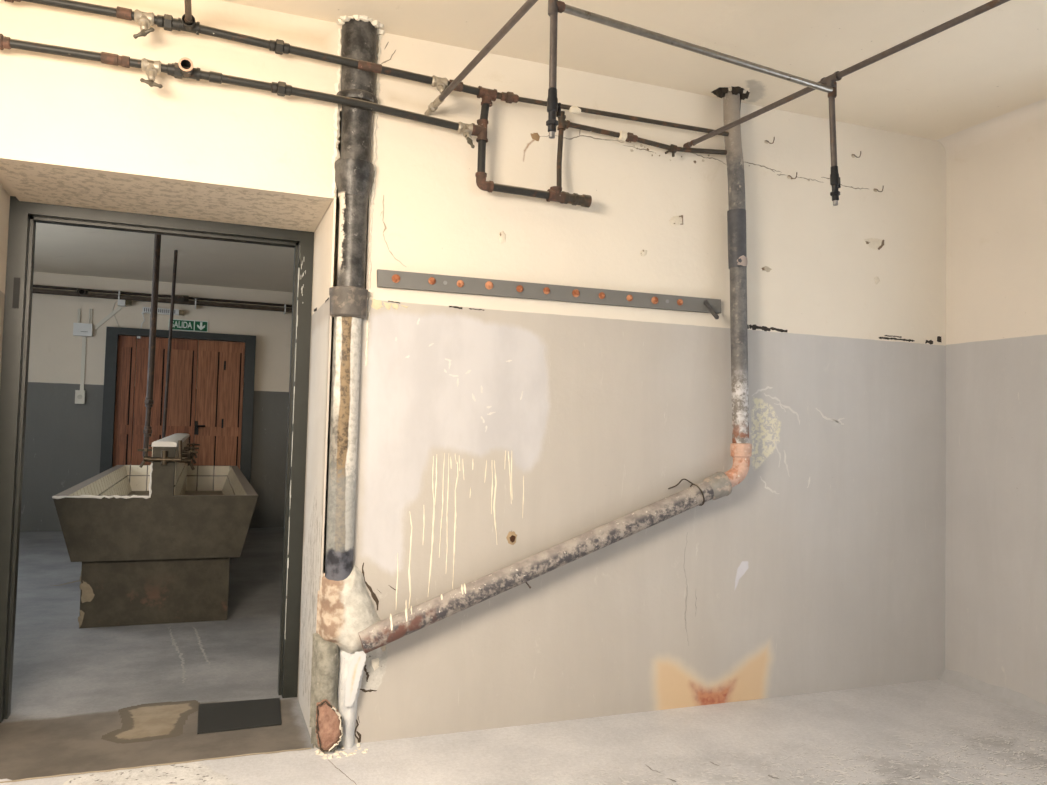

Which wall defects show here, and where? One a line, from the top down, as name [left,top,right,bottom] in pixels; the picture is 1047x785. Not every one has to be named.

flaking render [359,643,395,698]
flaking render [315,699,343,752]
crack [353,716,361,743]